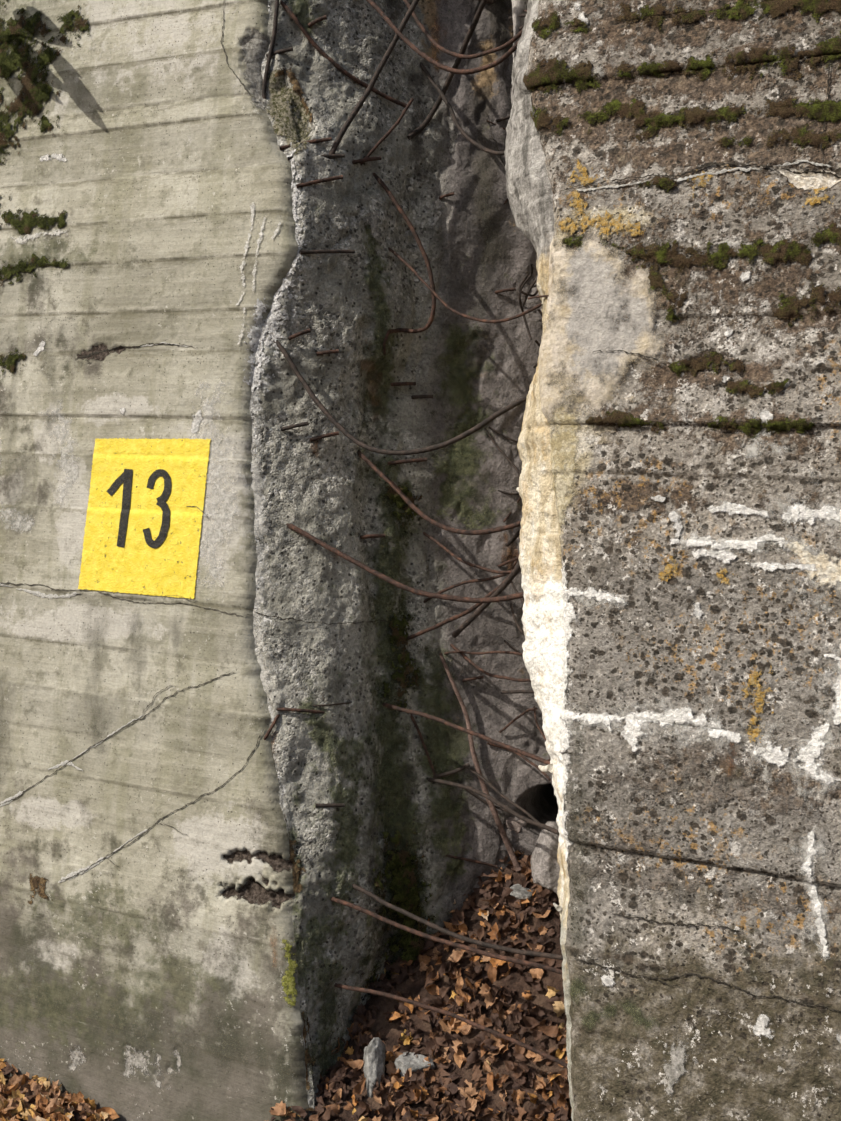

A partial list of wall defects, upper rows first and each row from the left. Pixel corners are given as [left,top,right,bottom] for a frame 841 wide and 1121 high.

spalling [240,0,555,355]
crack [561,60,841,192]
spalling [76,344,126,364]
crack [0,582,388,625]
damp [651,495,841,610]
crack [0,672,234,806]
crack [58,729,275,883]
spalling [264,340,574,1121]
damp [559,567,741,862]
damp [753,649,841,792]
spalling [220,850,295,911]
damp [801,831,829,957]